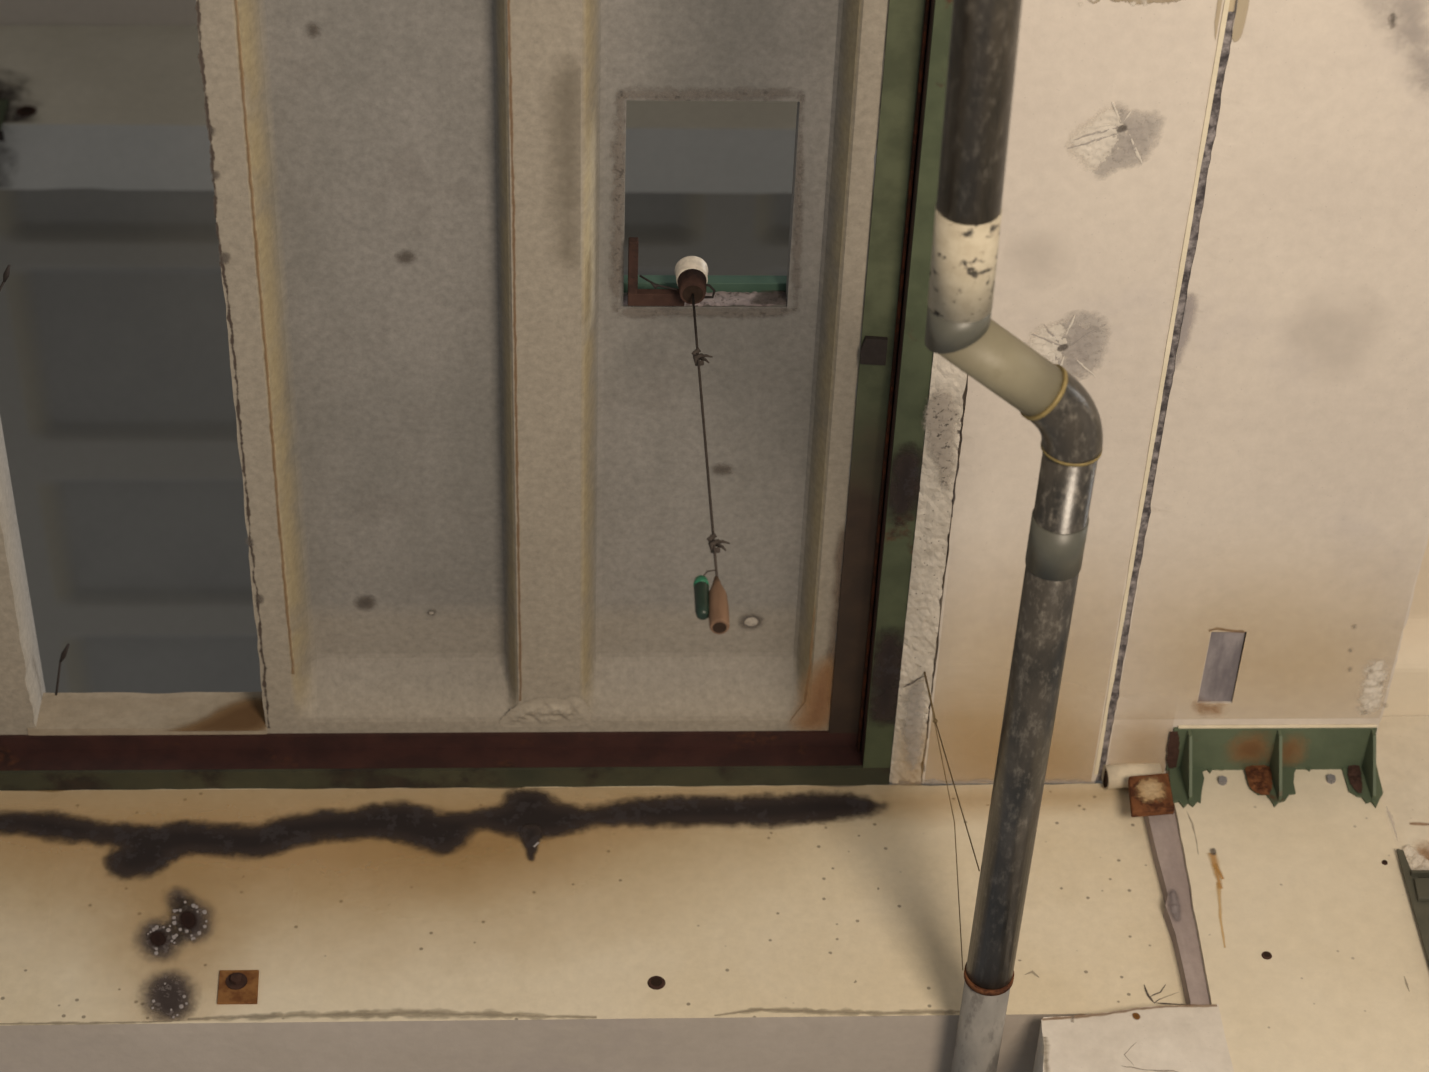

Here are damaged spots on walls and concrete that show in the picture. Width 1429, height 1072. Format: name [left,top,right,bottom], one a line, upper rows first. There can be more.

leakage [1215,0,1249,42]
crack [952,387,966,517]
crack [904,664,935,772]
corrosion [1128,773,1175,817]
corrosion [1209,848,1225,948]